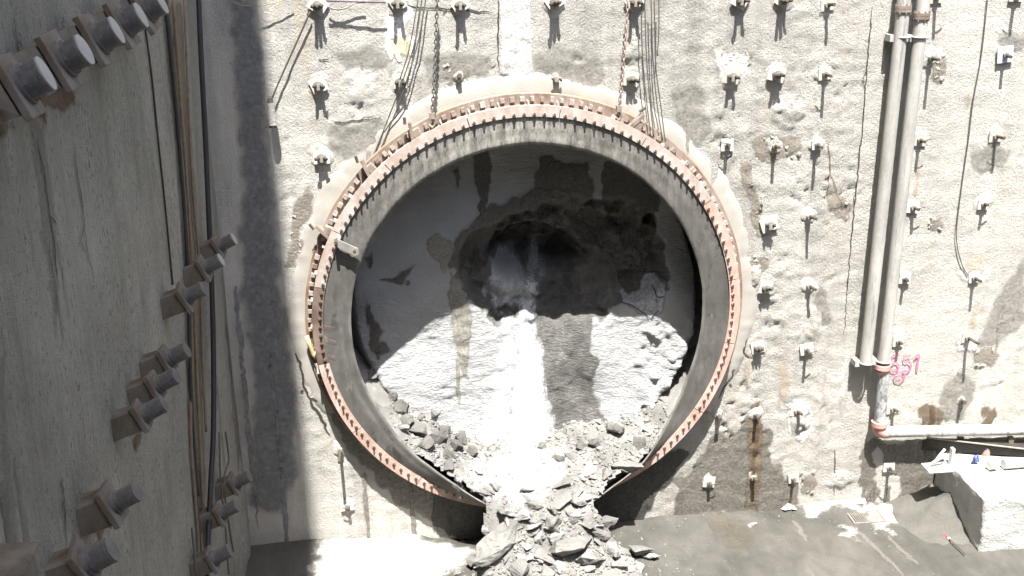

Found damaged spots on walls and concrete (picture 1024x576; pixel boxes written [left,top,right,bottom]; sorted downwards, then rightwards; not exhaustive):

crack [827,10,872,335]
rust [752,419,760,482]